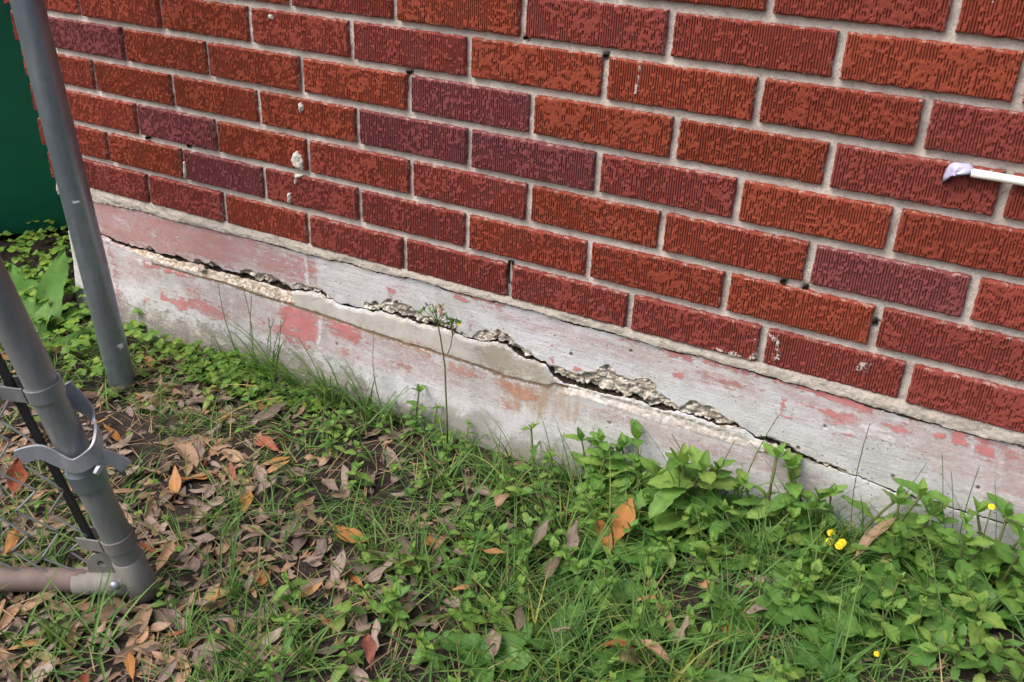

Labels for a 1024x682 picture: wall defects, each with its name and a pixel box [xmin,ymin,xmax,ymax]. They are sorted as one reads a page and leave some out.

crack [93,201,1024,528]
spalling [361,285,877,473]